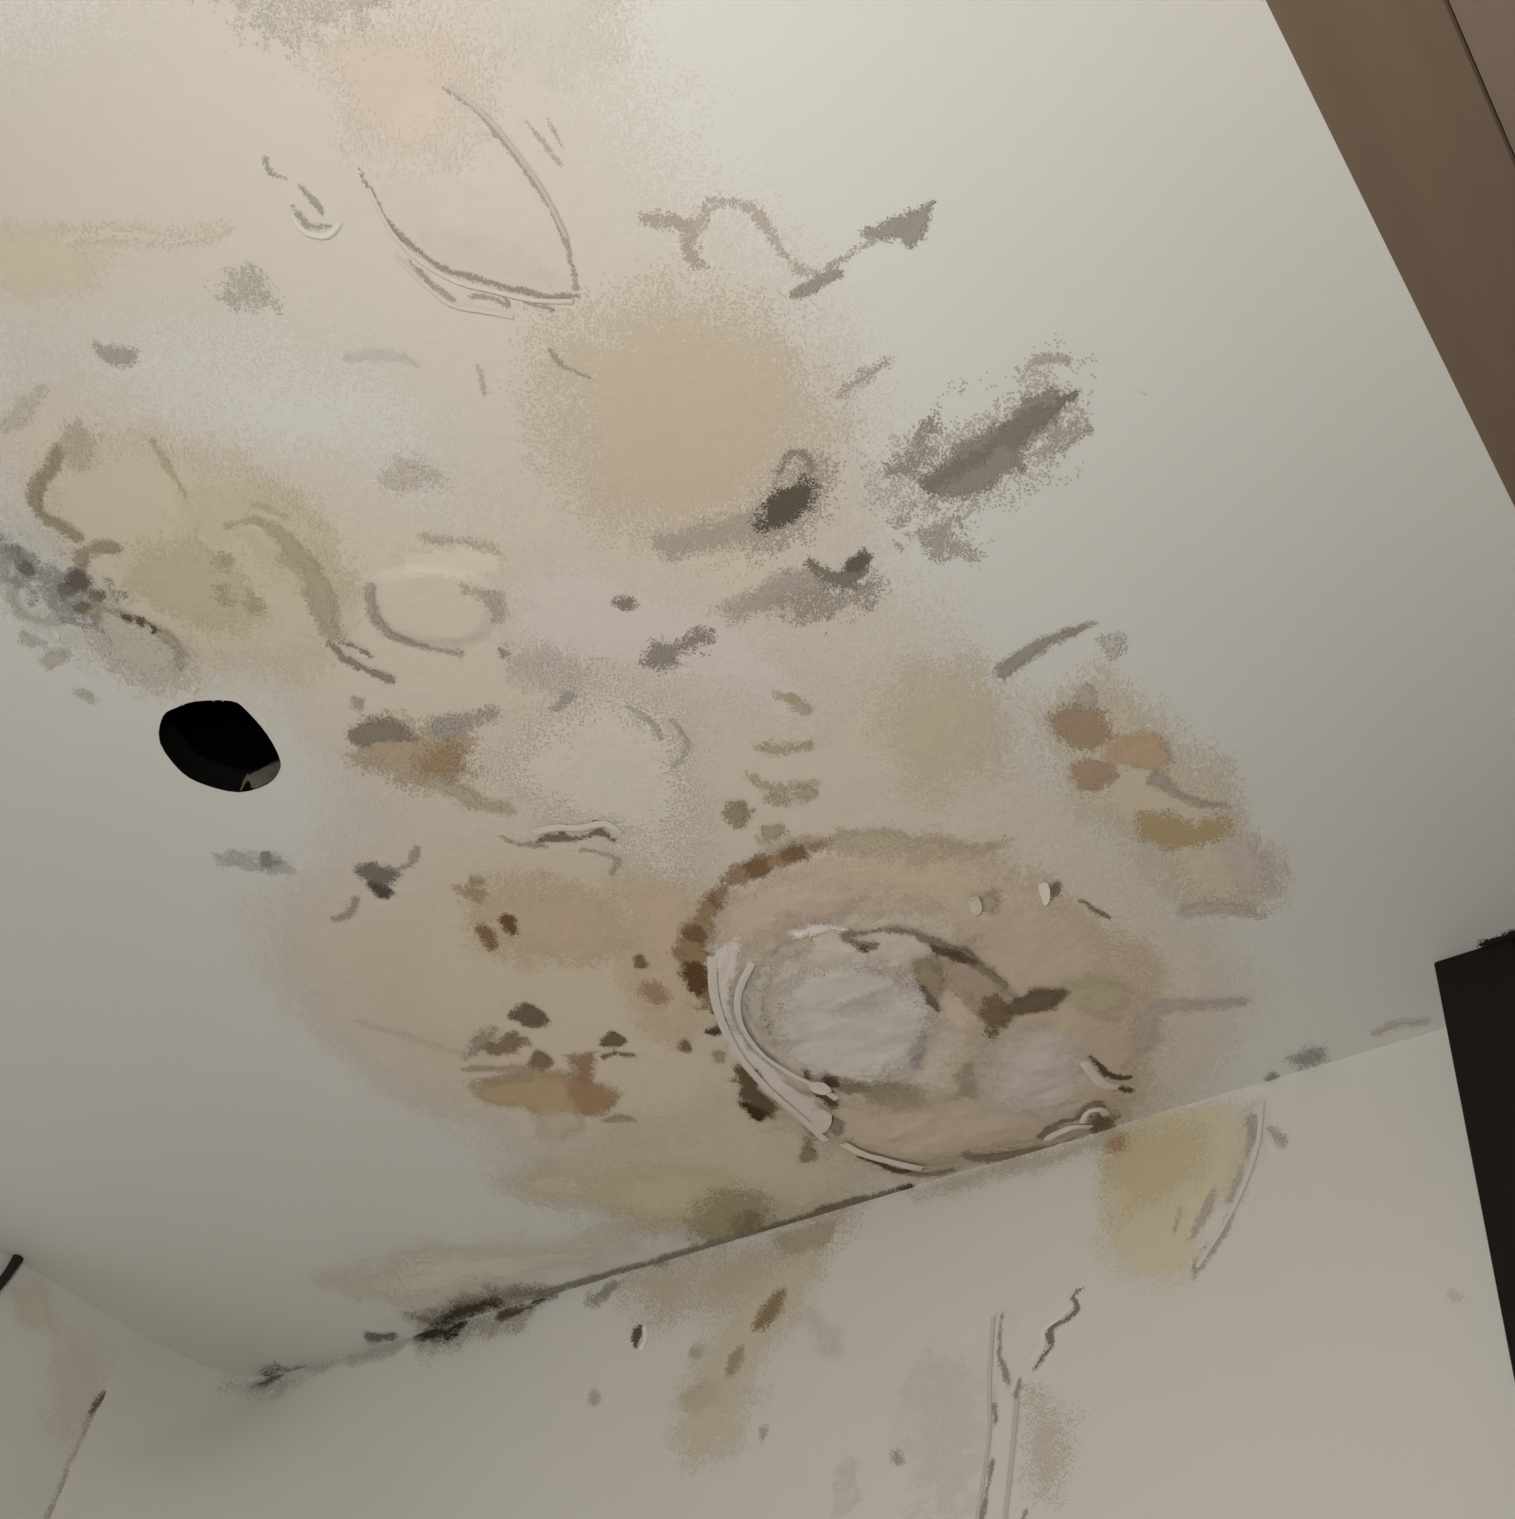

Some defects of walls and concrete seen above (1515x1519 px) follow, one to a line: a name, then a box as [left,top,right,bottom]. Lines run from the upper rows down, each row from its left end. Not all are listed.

peeling [785,921,849,940]
peeling [1039,882,1050,906]
rust [462,1049,623,1120]
peeling [701,933,924,1172]
spalling [976,993,1014,1042]
peeling [1043,1061,1120,1142]
leakage [1282,1042,1331,1070]
leakage [5,1277,120,1465]
crack [979,1286,1084,1519]
leakage [1008,1380,1095,1518]